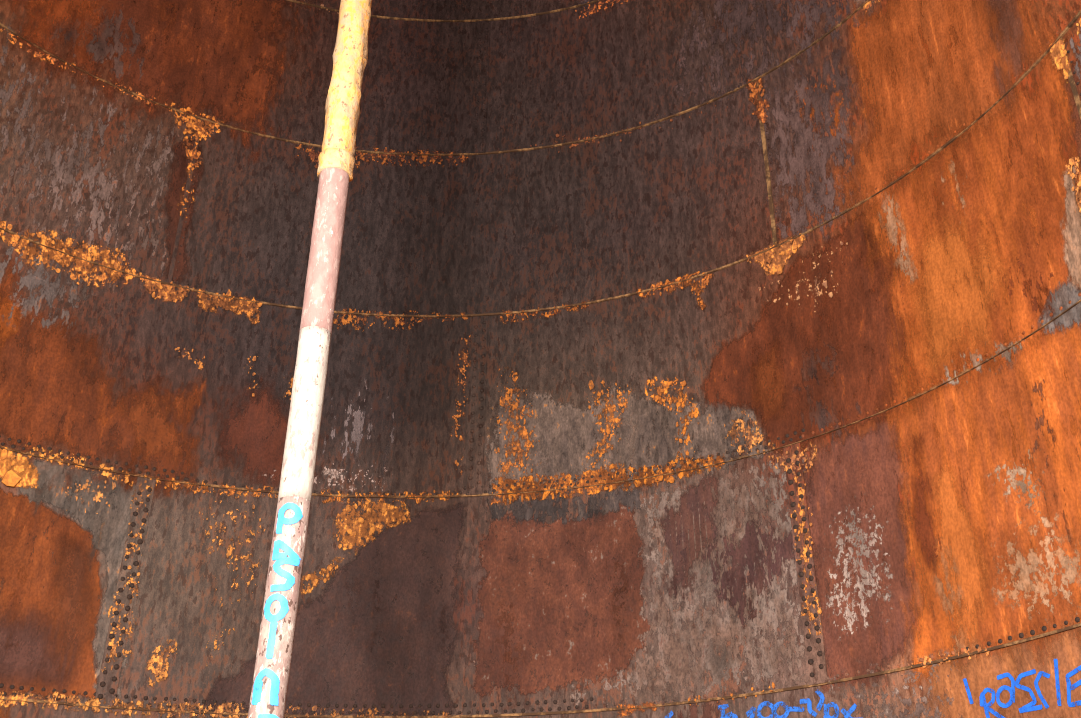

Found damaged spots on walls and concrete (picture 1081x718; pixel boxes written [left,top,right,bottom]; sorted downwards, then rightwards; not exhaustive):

rust [355,147,468,168]
rust [0,221,293,672]
rust [333,309,468,331]
rust [451,335,471,441]
rust [491,369,725,505]
rust [638,271,713,310]
peeling [470,51,918,707]
rust [724,0,1081,718]
rust [285,490,466,718]
rust [0,656,256,718]
rust [146,640,177,686]
rust [617,682,775,718]